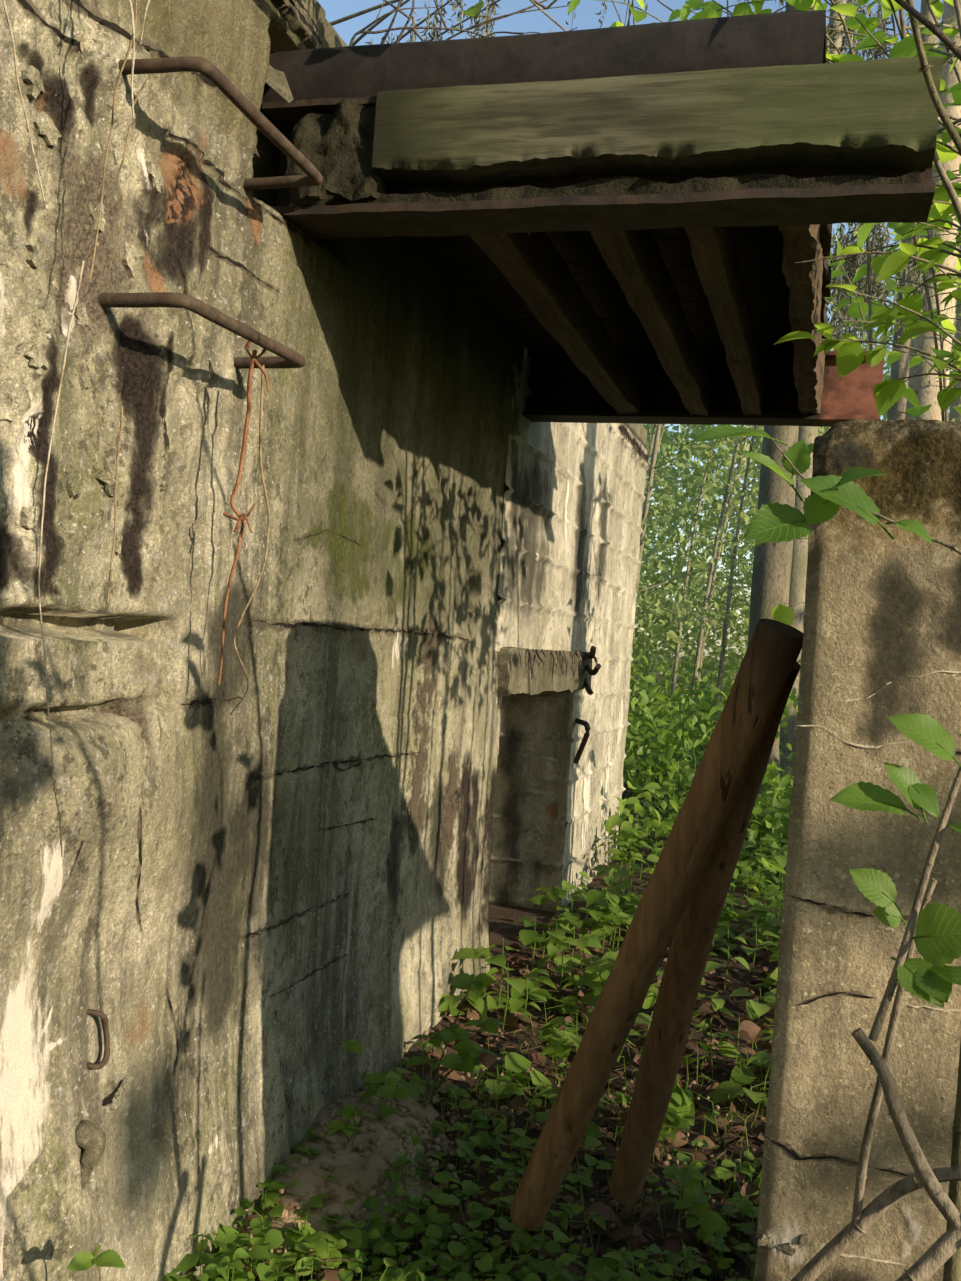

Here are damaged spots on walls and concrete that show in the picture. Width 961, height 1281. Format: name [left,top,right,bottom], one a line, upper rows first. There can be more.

corrosion [162,149,201,222]
corrosion [145,254,166,292]
water stain [113,315,174,596]
crack [245,615,468,643]
crack [181,696,242,711]
crack [245,750,422,783]
crack [326,818,376,830]
crack [238,893,349,940]
crack [784,893,909,920]
crack [270,954,348,997]
crack [759,1133,912,1177]
crack [840,1253,904,1265]